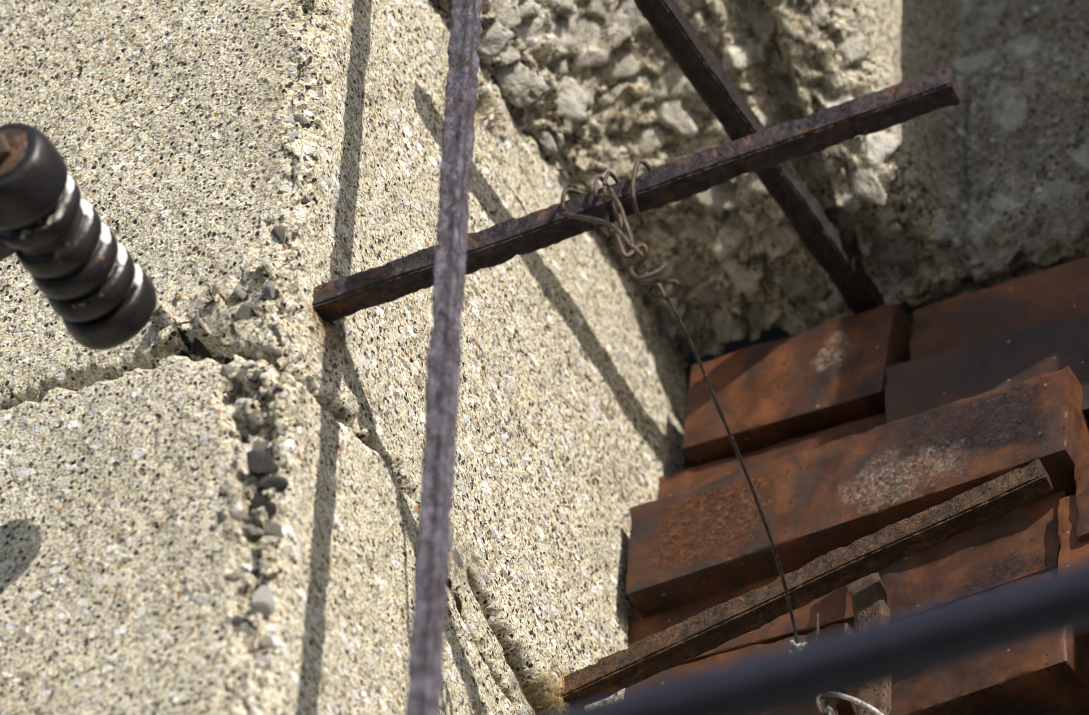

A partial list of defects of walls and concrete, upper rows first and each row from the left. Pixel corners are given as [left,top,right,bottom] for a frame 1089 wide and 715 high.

spalling [474,87,505,143]
crack [177,284,286,373]
crack [447,578,464,621]